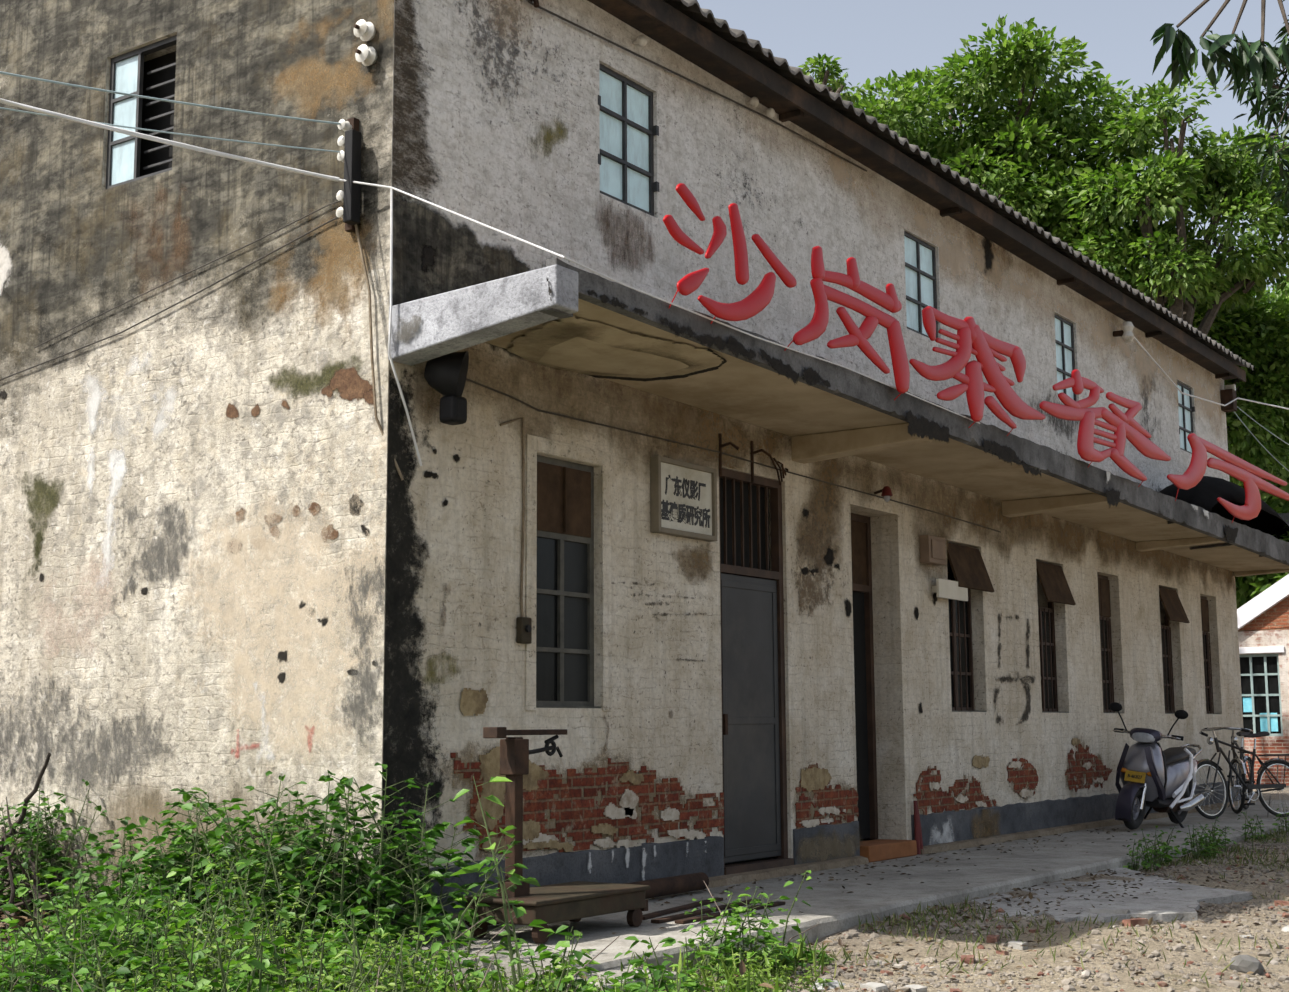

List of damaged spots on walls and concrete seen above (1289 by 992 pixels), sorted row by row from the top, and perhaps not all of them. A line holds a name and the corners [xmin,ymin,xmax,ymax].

water stain [0,0,543,404]
flaking render [321,367,374,405]
water stain [457,344,791,470]
water stain [87,448,190,602]
water stain [799,458,1235,588]
water stain [342,370,446,873]
water stain [0,678,314,903]
flaking render [448,744,506,860]
flaking render [523,749,724,852]
flaking render [795,763,859,829]
flaking render [914,755,997,815]
flaking render [1065,738,1113,792]